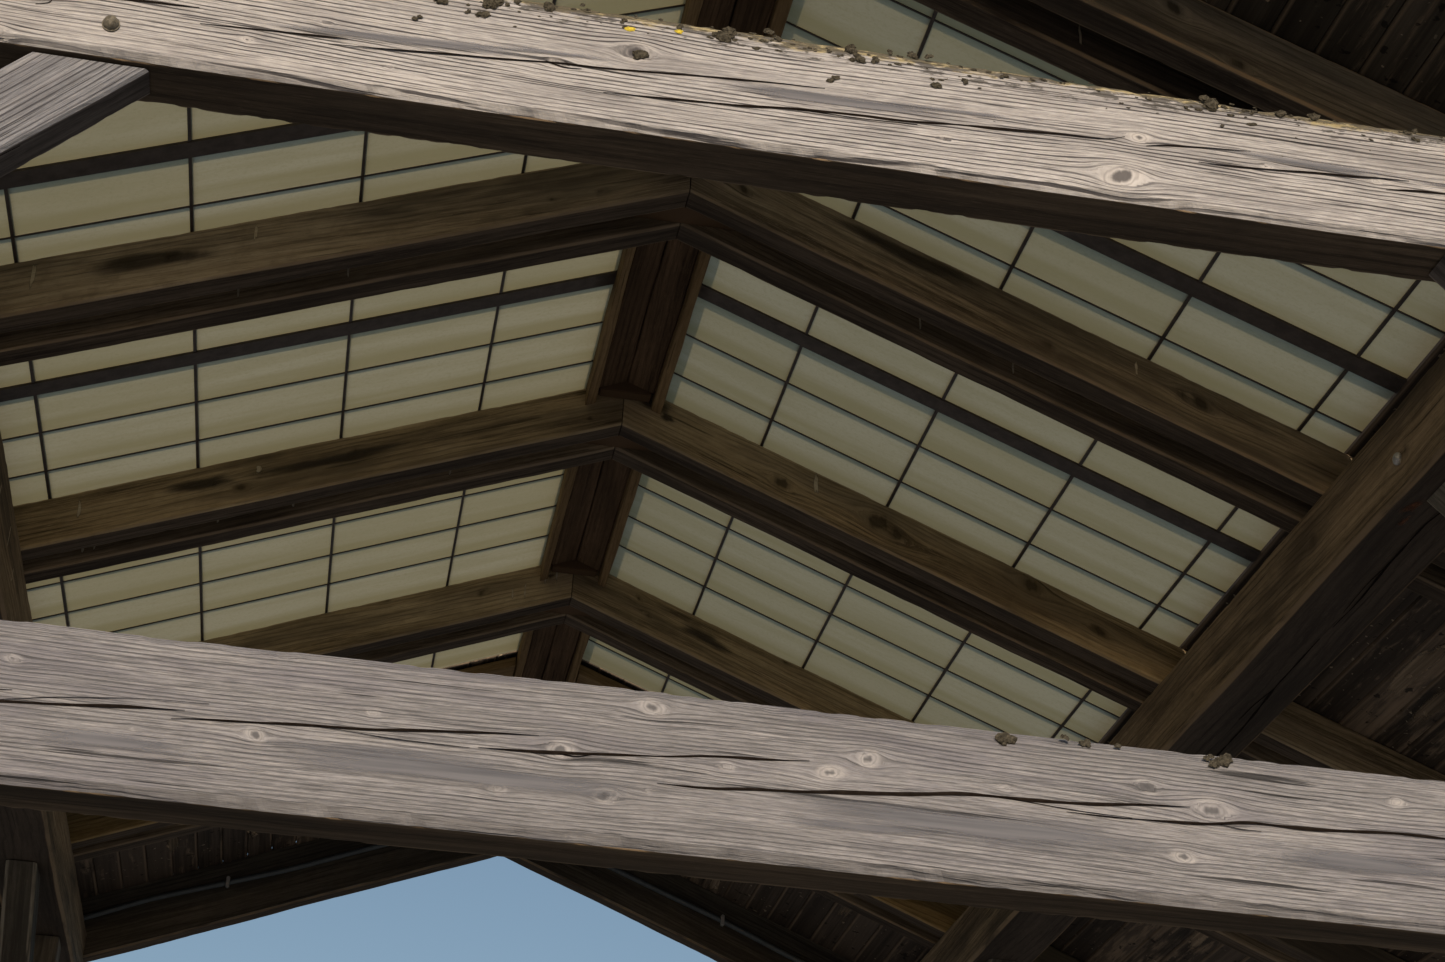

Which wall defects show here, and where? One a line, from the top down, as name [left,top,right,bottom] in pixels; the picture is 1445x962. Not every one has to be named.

crack [129,0,1445,195]
crack [0,689,1445,839]